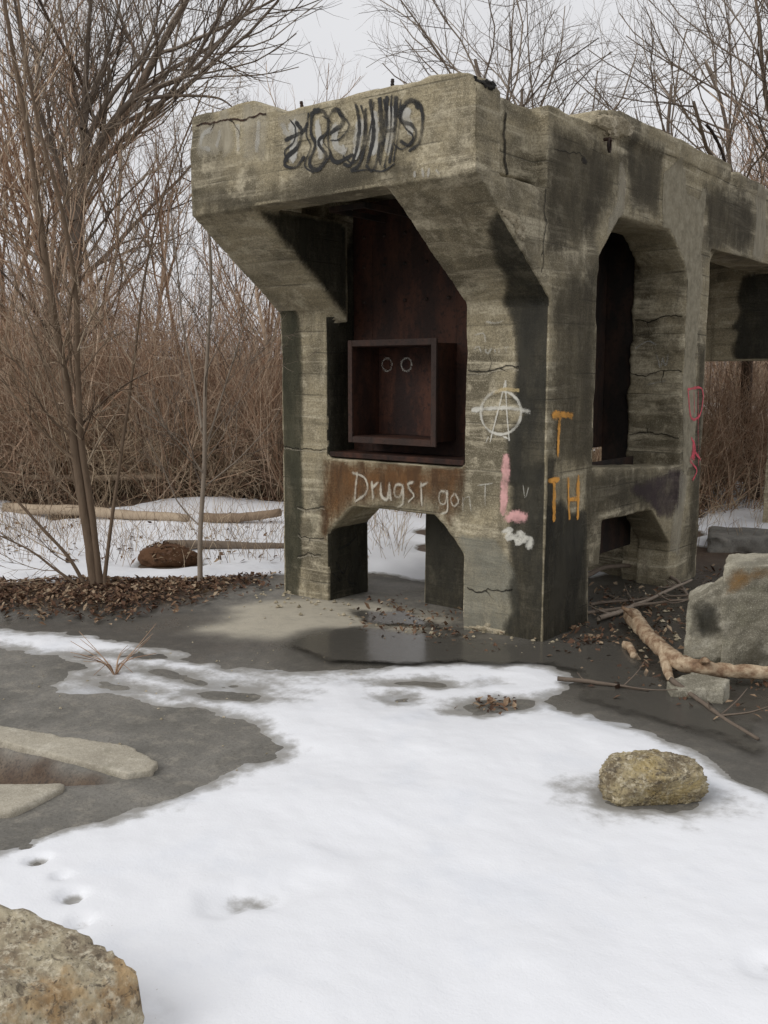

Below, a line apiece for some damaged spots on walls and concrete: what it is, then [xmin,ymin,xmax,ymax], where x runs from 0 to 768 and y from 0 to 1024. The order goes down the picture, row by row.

crack [196,112,266,131]
crack [502,113,510,177]
leakage [549,135,664,244]
leakage [705,185,767,259]
crack [634,315,682,334]
crack [468,358,519,372]
leakage [488,214,705,642]
crack [467,587,512,599]